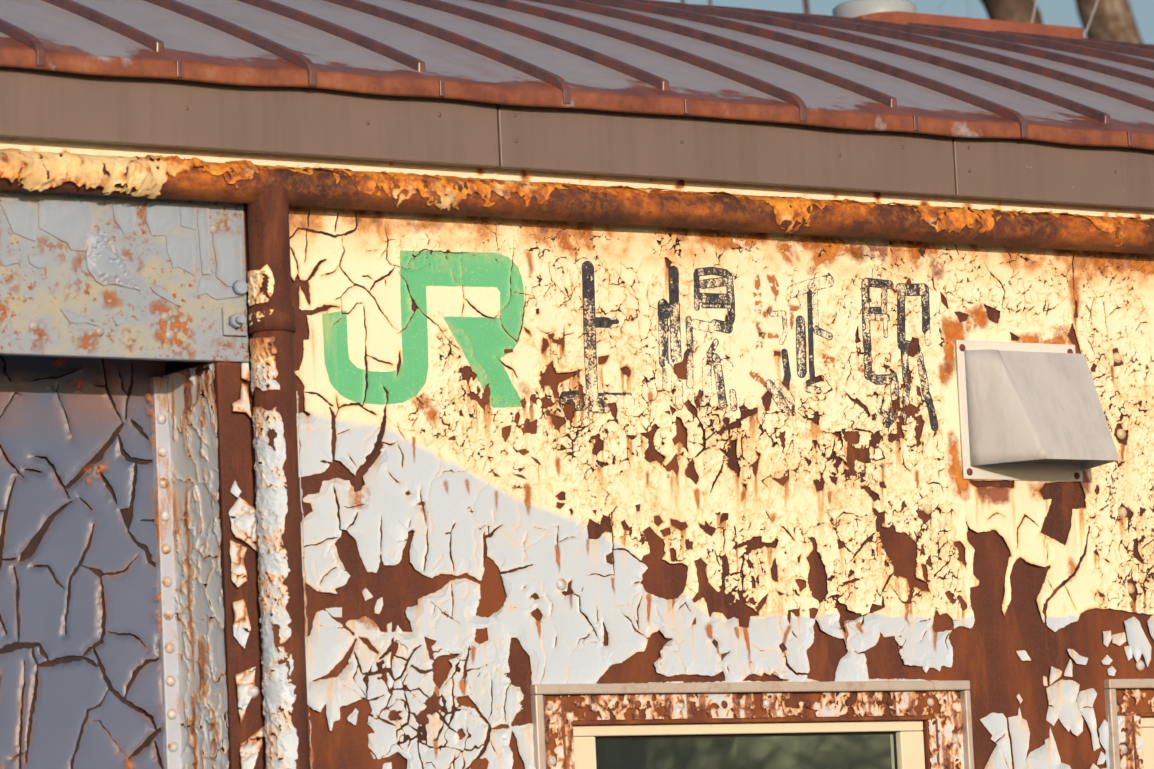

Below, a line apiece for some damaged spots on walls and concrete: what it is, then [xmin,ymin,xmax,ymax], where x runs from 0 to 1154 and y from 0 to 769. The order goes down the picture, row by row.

corrosion [560,228,590,250]
peeling [0,148,1154,326]
corrosion [702,233,765,249]
corrosion [777,239,887,272]
corrosion [910,242,942,278]
corrosion [940,306,988,383]
peeling [19,422,124,562]
peeling [120,489,133,530]
peeling [163,271,1154,769]
crack [290,211,1154,769]
corrosion [948,433,1009,503]
corrosion [1081,470,1090,491]